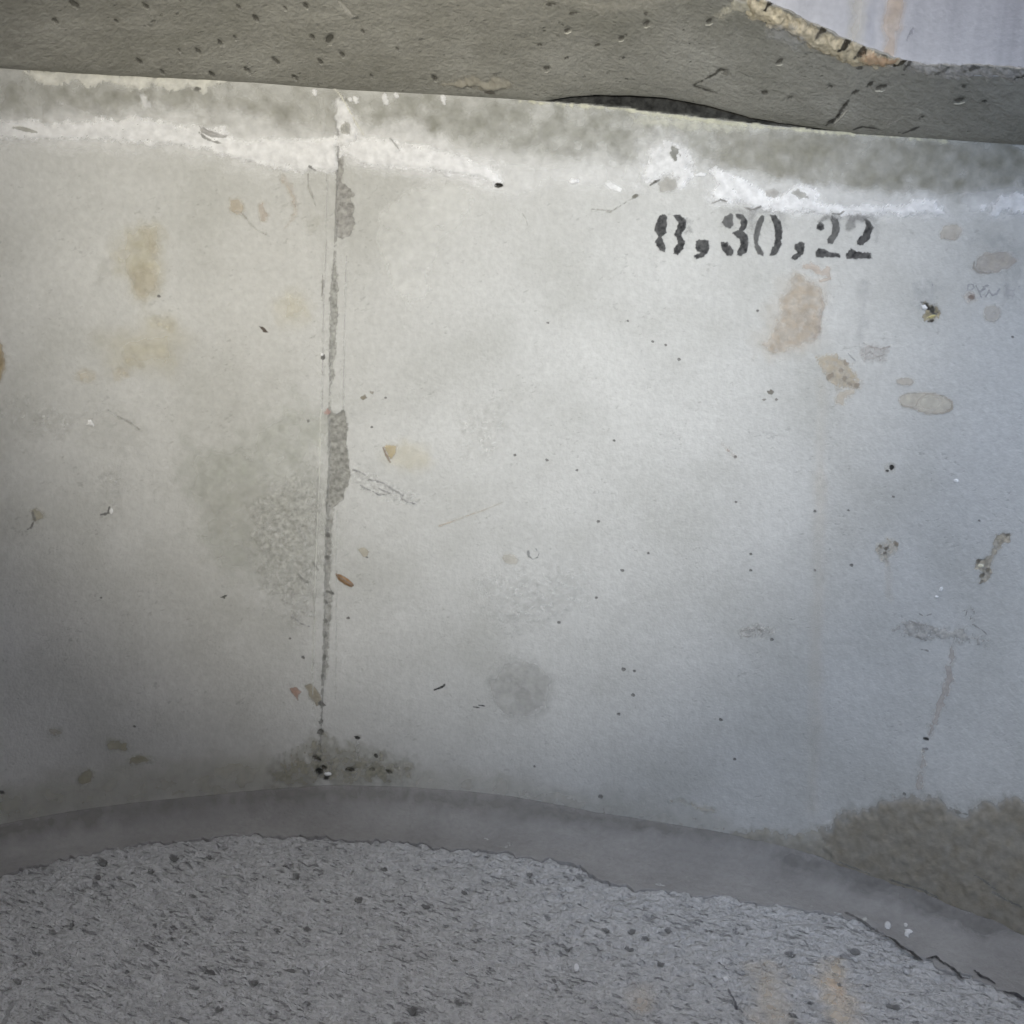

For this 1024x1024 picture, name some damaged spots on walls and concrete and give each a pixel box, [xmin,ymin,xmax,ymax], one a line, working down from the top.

spalling [746,0,1024,105]
water stain [0,70,1024,240]
water stain [764,263,830,353]
crack [292,131,355,776]
water stain [783,853,1013,935]